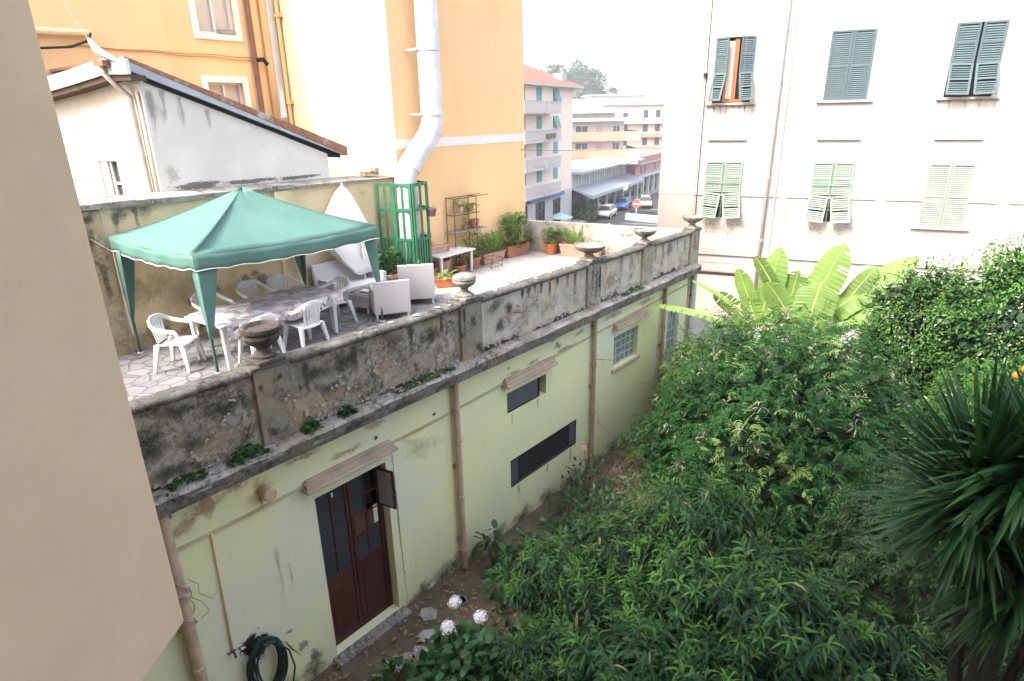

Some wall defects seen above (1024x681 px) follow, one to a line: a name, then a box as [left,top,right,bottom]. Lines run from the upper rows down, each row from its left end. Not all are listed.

damp [204,391,251,416]
damp [141,436,161,458]
damp [157,465,185,481]